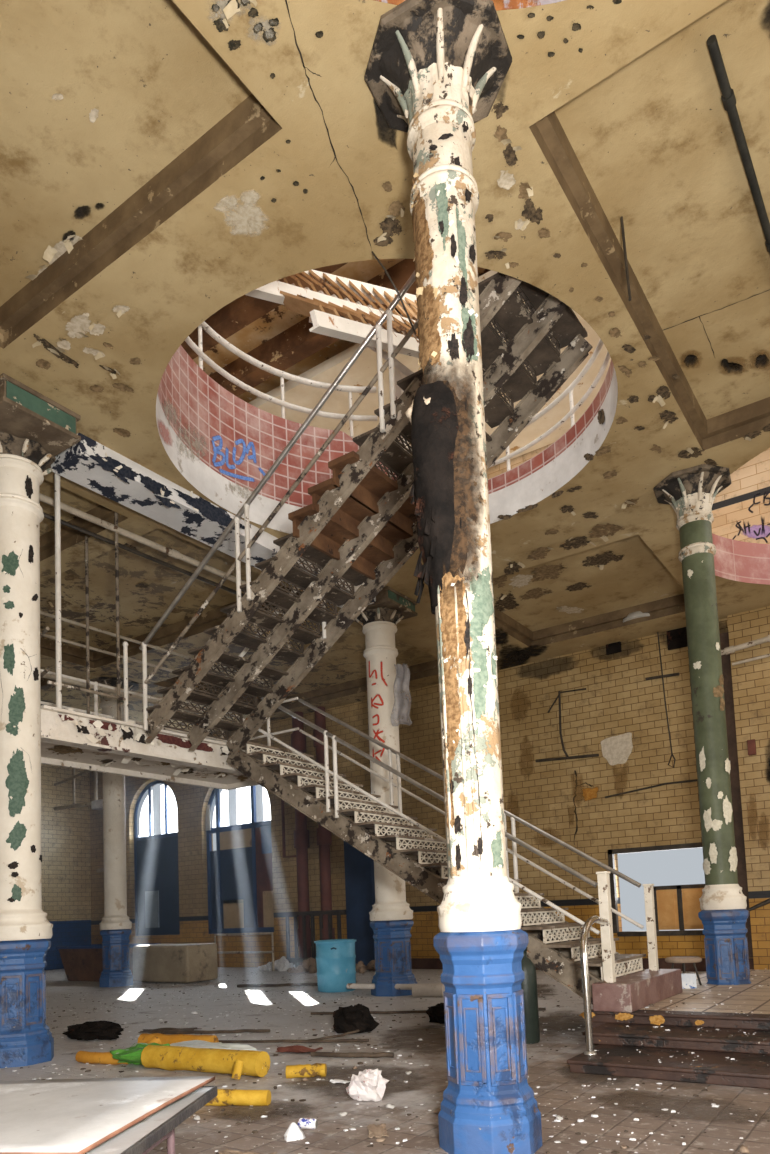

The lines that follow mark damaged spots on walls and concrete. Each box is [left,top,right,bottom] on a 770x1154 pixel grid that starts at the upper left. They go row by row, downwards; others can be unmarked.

flaking render [211,0,279,51]
crack [285,0,372,249]
peeling [25,231,83,280]
flaking render [74,203,104,219]
peeling [373,101,551,371]
peeling [25,475,33,499]
peeling [89,453,245,530]
peeling [2,545,34,618]
peeling [440,486,625,870]
peeling [0,641,42,902]
peeling [601,732,633,765]
peeling [699,746,738,875]